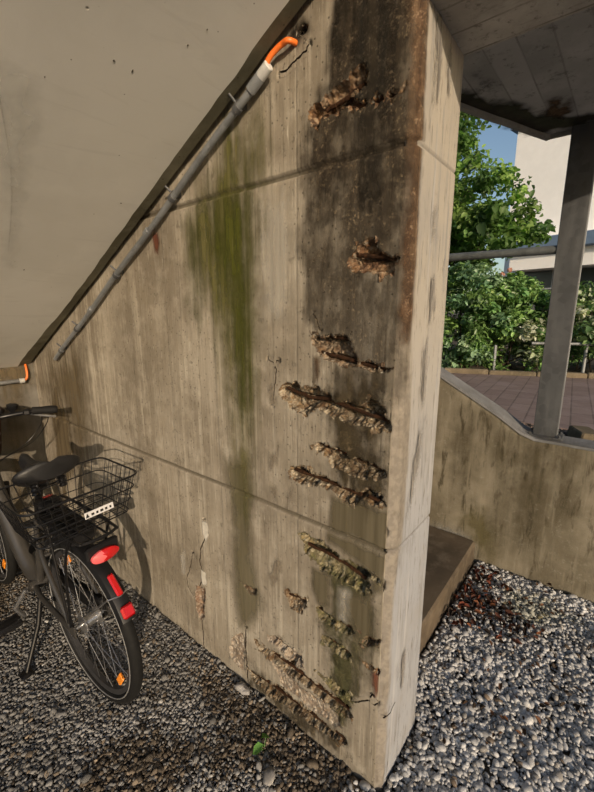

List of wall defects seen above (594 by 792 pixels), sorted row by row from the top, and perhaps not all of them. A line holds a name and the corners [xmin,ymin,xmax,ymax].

crack [279,42,312,78]
damp [289,20,308,42]
damp [302,0,452,402]
spalling [310,330,394,373]
spalling [270,380,392,434]
spalling [288,442,387,510]
damp [335,417,376,464]
damp [411,433,421,503]
crack [185,519,209,651]
spalling [297,532,381,596]
spalling [284,588,381,664]
spalling [229,633,354,747]